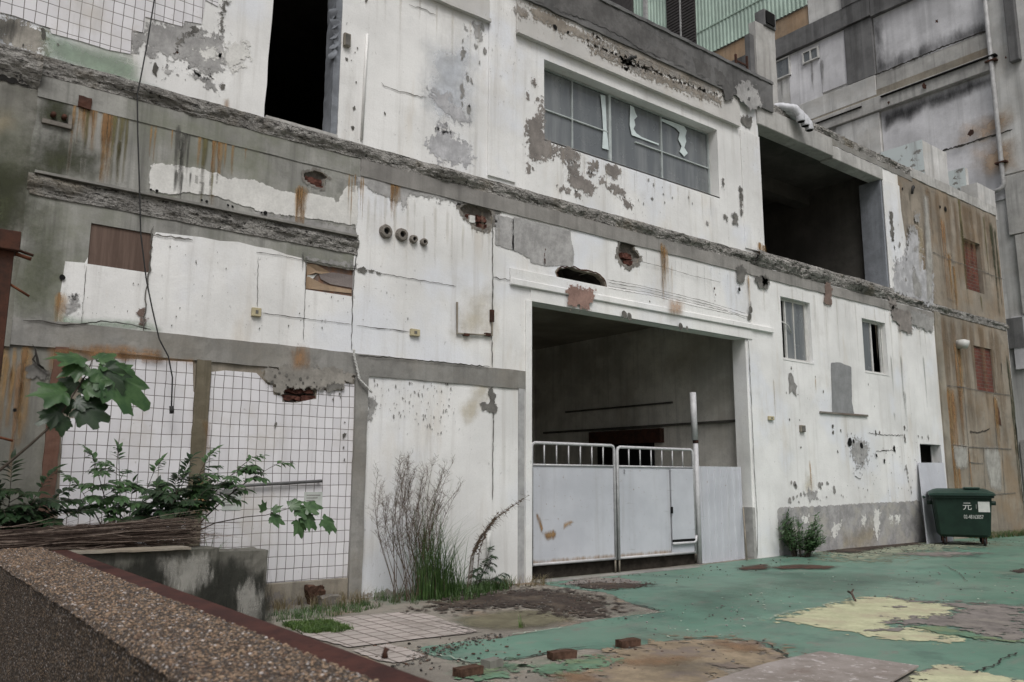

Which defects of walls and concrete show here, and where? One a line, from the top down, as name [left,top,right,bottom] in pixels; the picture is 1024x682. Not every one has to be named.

peeling [131,0,252,97]
peeling [513,1,788,128]
rust [72,105,113,175]
rust [198,137,233,172]
peeling [424,73,477,170]
peeling [524,77,673,210]
peeling [149,163,607,311]
spalling [615,241,643,271]
peeling [888,210,936,334]
peeling [260,363,357,403]
spalling [480,387,498,418]
peeling [738,425,1023,570]